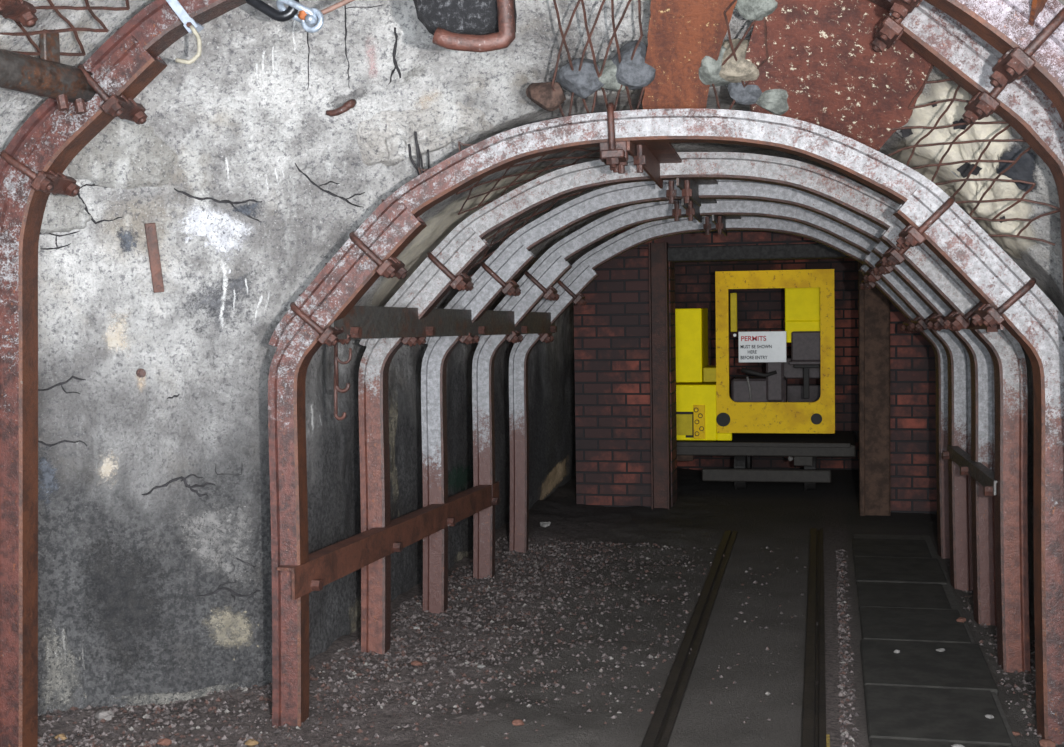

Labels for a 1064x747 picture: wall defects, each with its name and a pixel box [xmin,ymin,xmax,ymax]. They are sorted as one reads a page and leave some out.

crack [295,163,365,207]
crack [40,184,122,250]
crack [174,188,262,222]
crack [38,375,86,394]
crack [38,439,87,447]
crack [142,466,242,497]
crack [196,528,261,601]